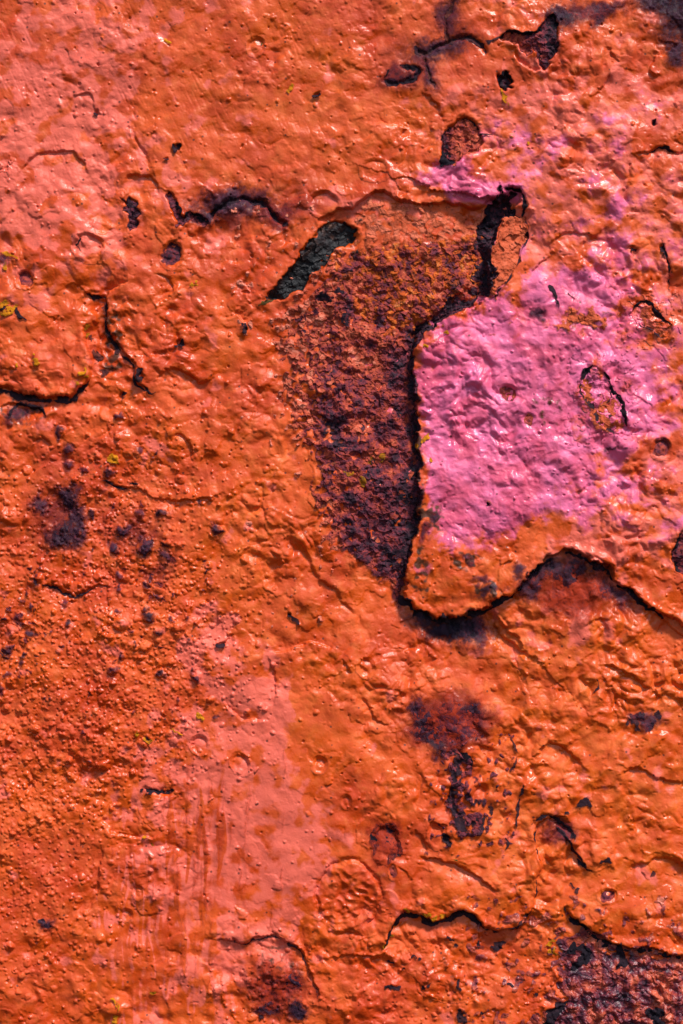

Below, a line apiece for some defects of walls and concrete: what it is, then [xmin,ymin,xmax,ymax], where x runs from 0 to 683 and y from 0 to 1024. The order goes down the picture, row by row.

crack [380,0,501,89]
crack [191,186,294,230]
spalling [309,188,343,222]
crack [0,293,156,425]
rust [30,483,87,549]
crack [398,551,664,641]
rust [397,693,524,856]
crack [383,880,538,949]
rust [446,882,683,1024]
crack [564,907,681,959]